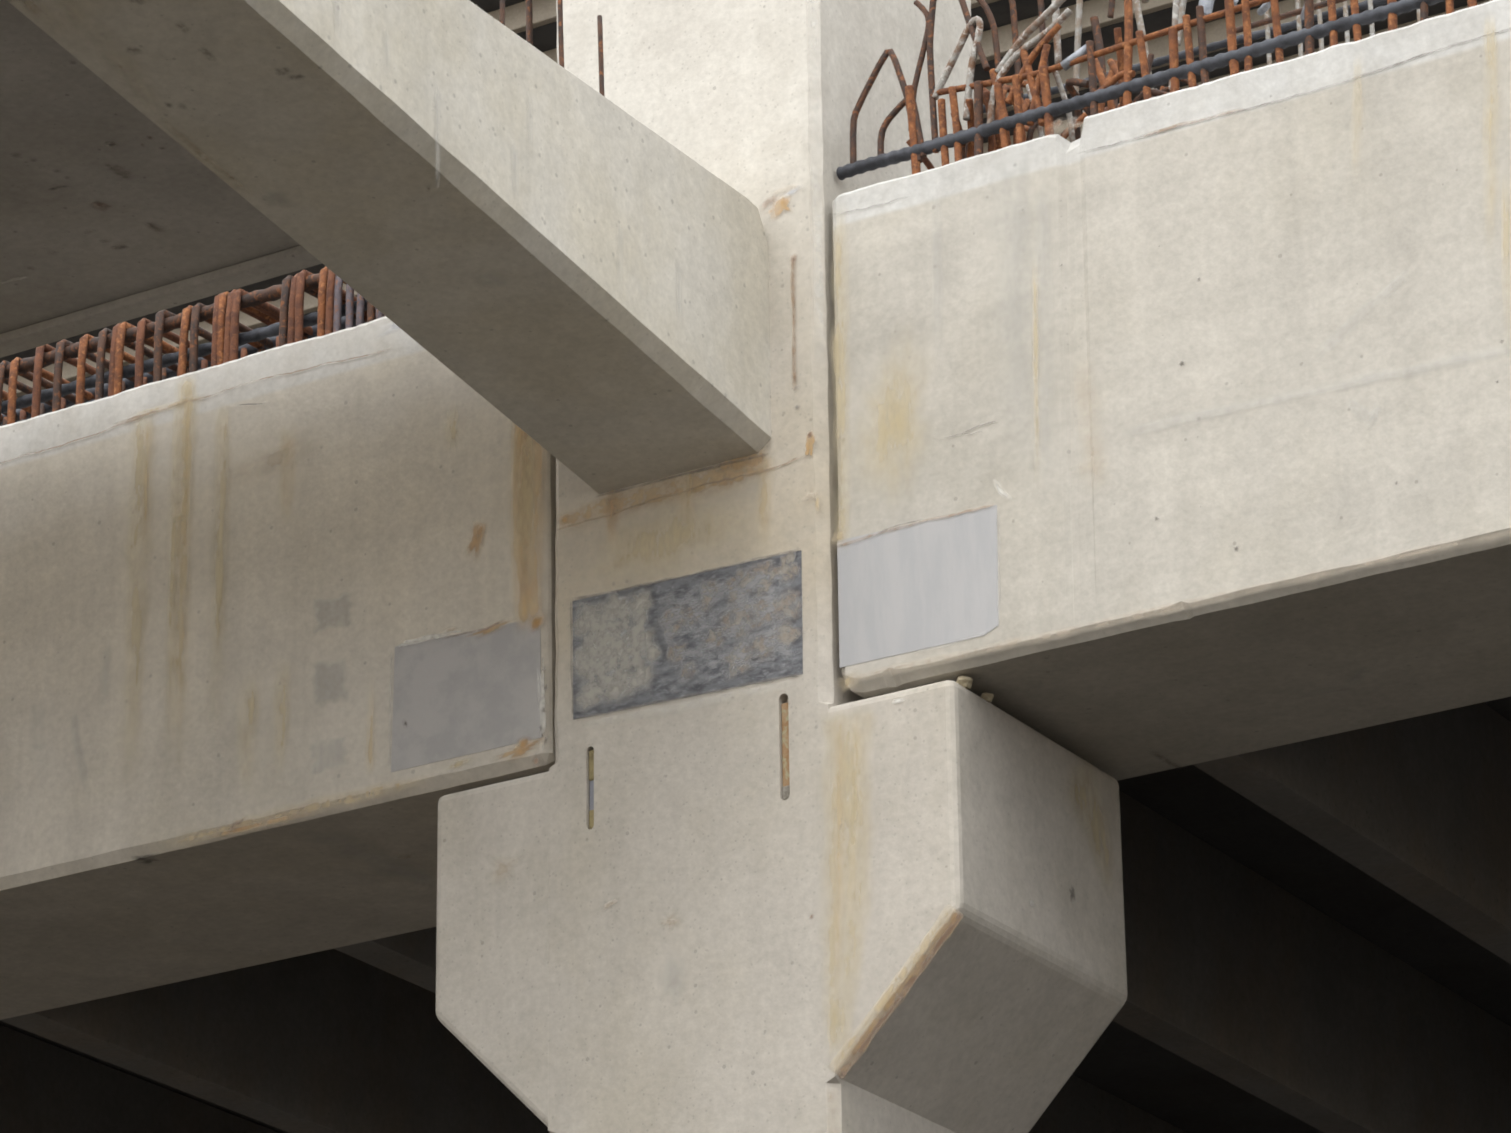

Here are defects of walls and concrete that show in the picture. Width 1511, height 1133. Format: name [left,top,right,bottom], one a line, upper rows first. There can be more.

crack [0,355,368,463]
corrosion [805,432,815,455]